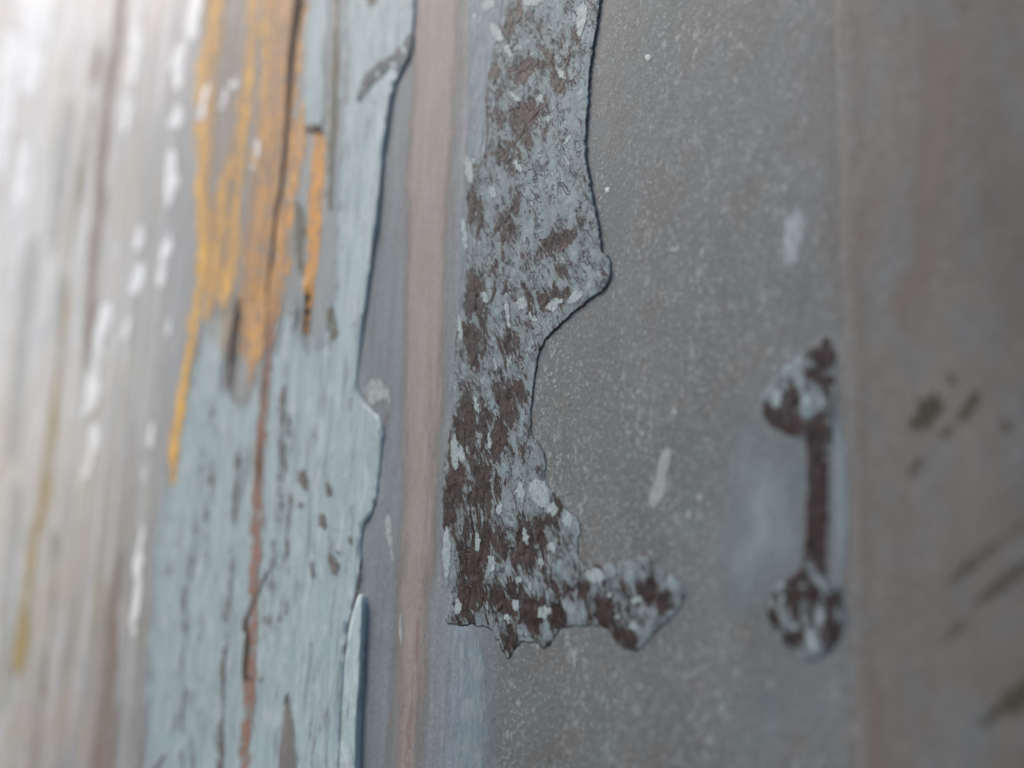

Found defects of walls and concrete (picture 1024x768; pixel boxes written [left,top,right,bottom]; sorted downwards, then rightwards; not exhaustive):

peeling [81,298,113,480]
rust [168,0,326,768]
peeling [127,0,416,768]
peeling [440,0,685,659]
peeling [760,337,846,662]